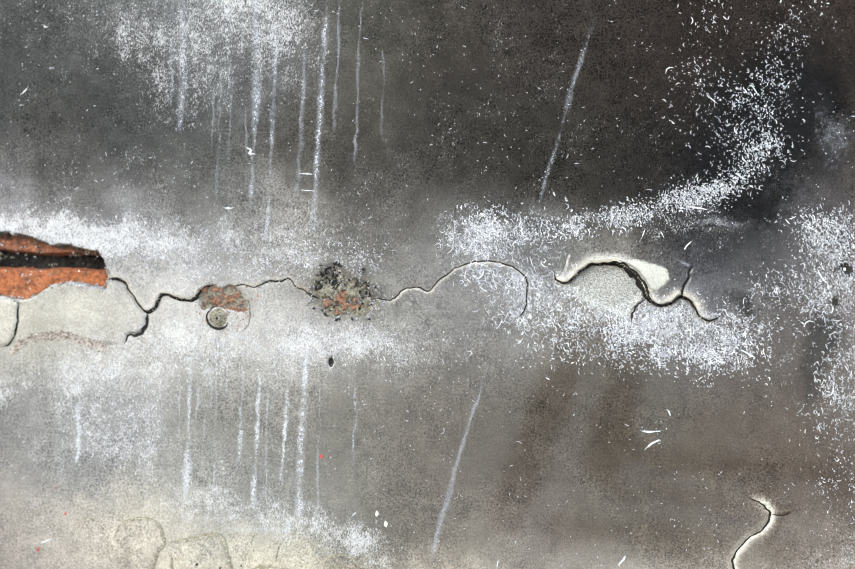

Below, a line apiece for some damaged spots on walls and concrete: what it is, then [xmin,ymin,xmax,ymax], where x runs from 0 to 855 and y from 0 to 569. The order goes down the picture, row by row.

crack [5,304,19,346]
spalling [0,229,112,304]
crack [108,277,212,346]
water stain [50,214,454,483]
crack [235,278,321,300]
crack [376,260,529,318]
flaking render [570,257,669,321]
crack [553,261,721,324]
water stain [434,0,855,520]
water stain [183,450,192,492]
crack [731,495,795,569]